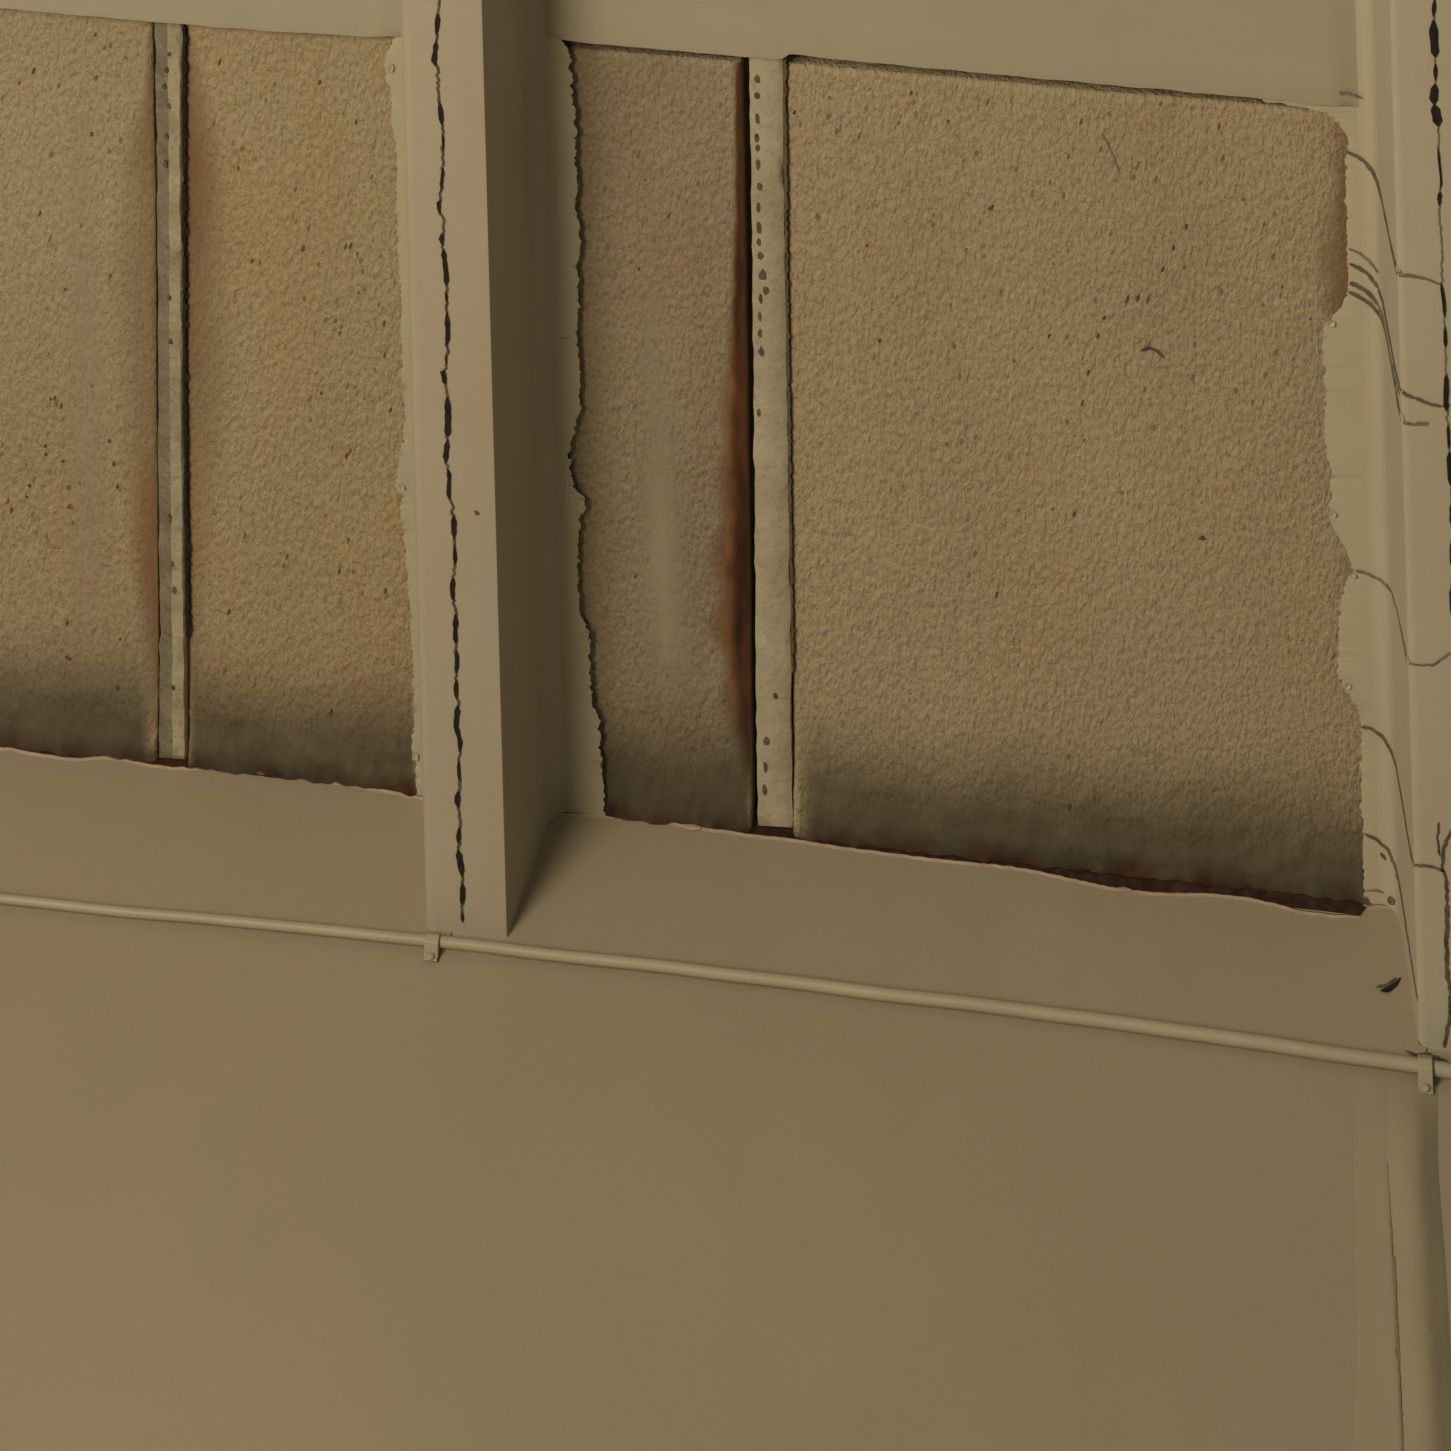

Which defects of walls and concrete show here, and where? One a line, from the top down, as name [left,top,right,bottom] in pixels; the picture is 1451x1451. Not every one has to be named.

crack [1339,91,1363,99]
leakage [0,689,145,761]
peeling [0,37,451,936]
leakage [192,713,412,790]
crack [431,0,465,923]
leakage [601,753,747,831]
corrosion [718,62,751,752]
peeling [501,38,1447,1062]
leakage [807,779,1371,905]
crack [1346,0,1451,612]
crack [1355,570,1450,667]
crack [1361,725,1451,1048]